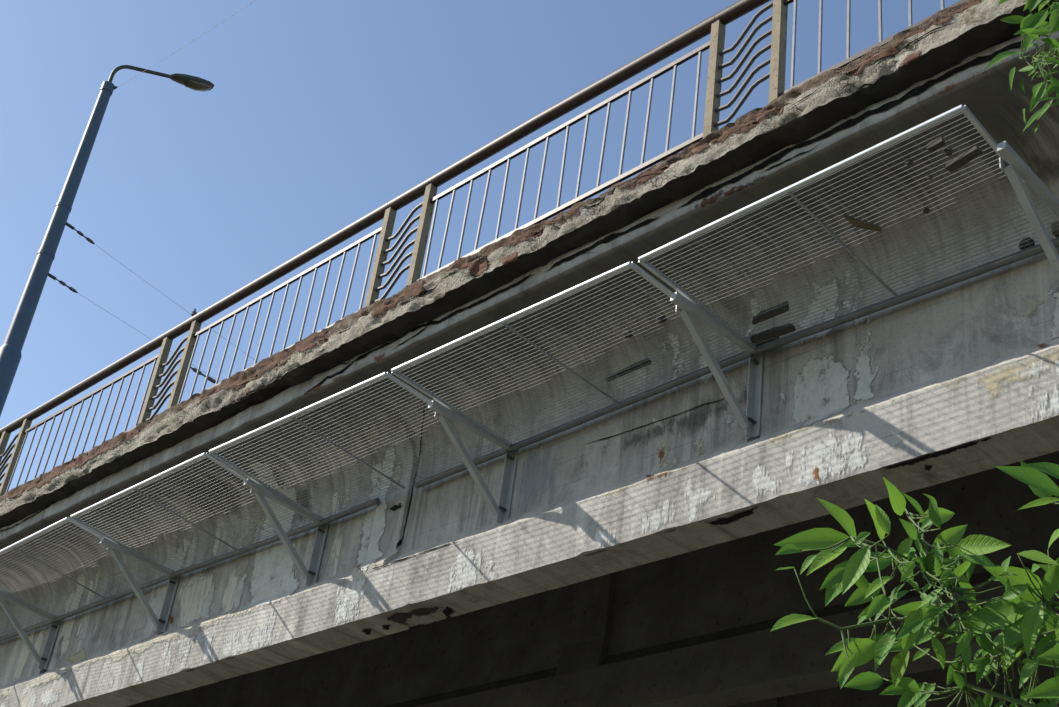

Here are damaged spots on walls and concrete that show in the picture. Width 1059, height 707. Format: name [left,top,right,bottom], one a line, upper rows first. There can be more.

spalling [223,361,306,407]
peeling [778,268,878,429]
damp [979,343,1059,422]